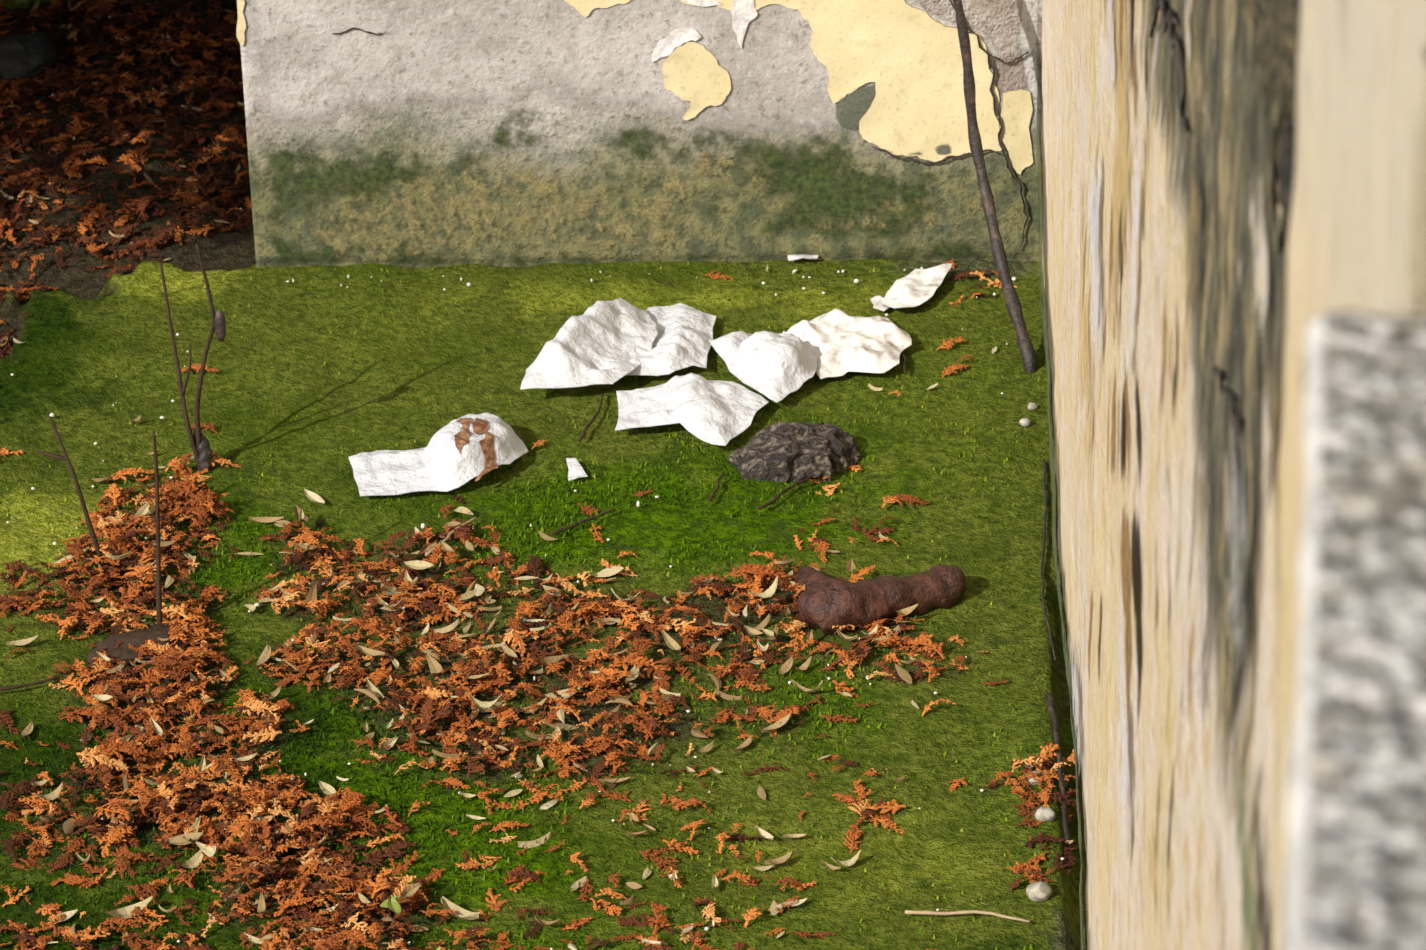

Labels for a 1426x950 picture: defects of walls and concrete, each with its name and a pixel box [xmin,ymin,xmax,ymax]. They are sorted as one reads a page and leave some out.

peeling [247,0,876,137]
flaking render [921,0,1028,96]
crack [1150,0,1190,132]
spalling [911,144,950,155]
water stain [1227,461,1248,668]